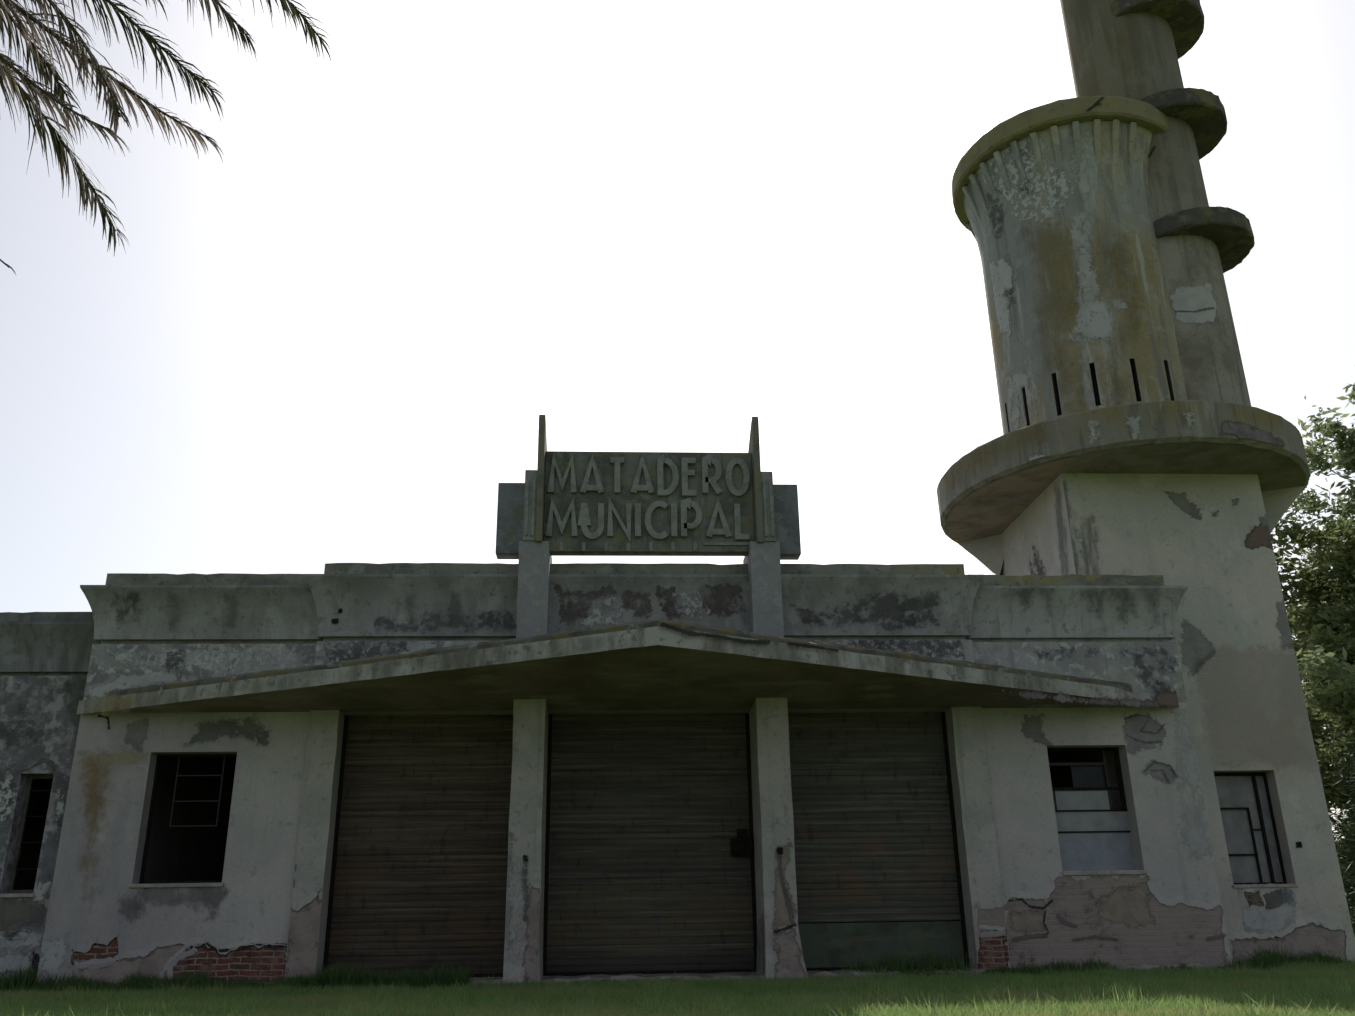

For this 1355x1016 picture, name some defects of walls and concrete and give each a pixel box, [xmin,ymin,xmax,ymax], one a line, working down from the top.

peeling [979,132,1127,345]
peeling [1004,371,1038,423]
peeling [1164,491,1239,520]
flaking render [1244,514,1274,550]
peeling [1002,689,1179,784]
peeling [0,771,19,822]
peeling [53,773,70,834]
flaking render [0,865,323,986]
spalling [756,839,808,980]
flaking render [972,869,1353,972]